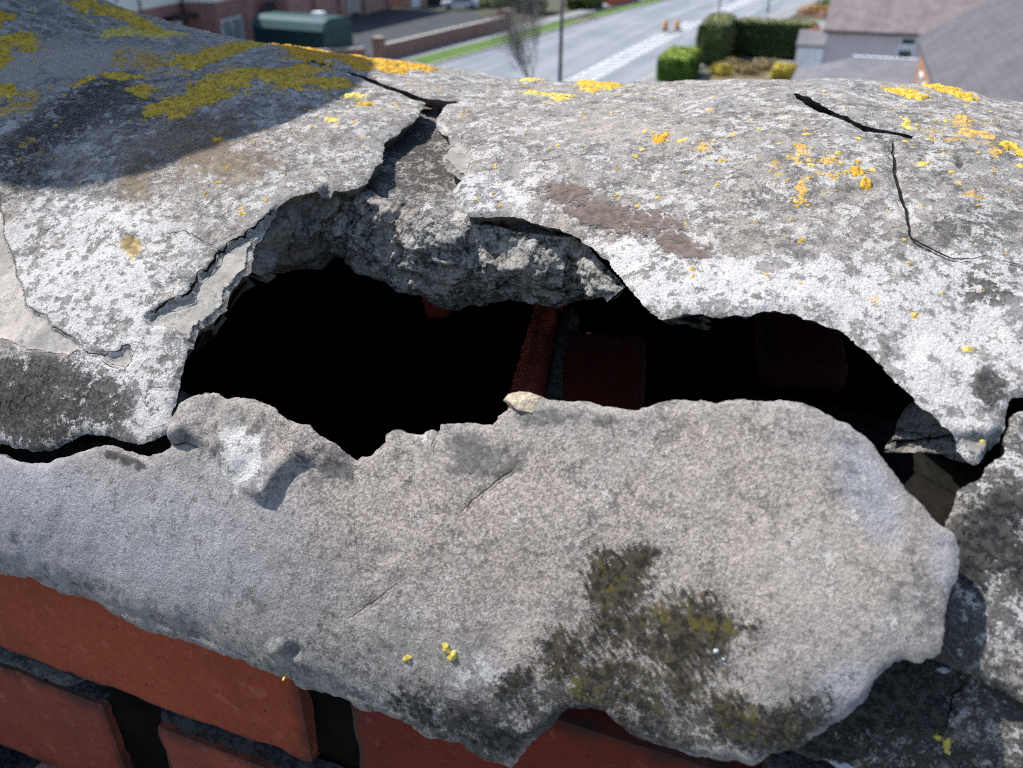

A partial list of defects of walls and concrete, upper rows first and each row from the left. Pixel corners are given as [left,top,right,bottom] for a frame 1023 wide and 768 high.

crack [148,208,274,313]
spalling [147,109,625,340]
crack [872,131,1020,264]
crack [0,437,205,464]
leakage [374,537,960,764]